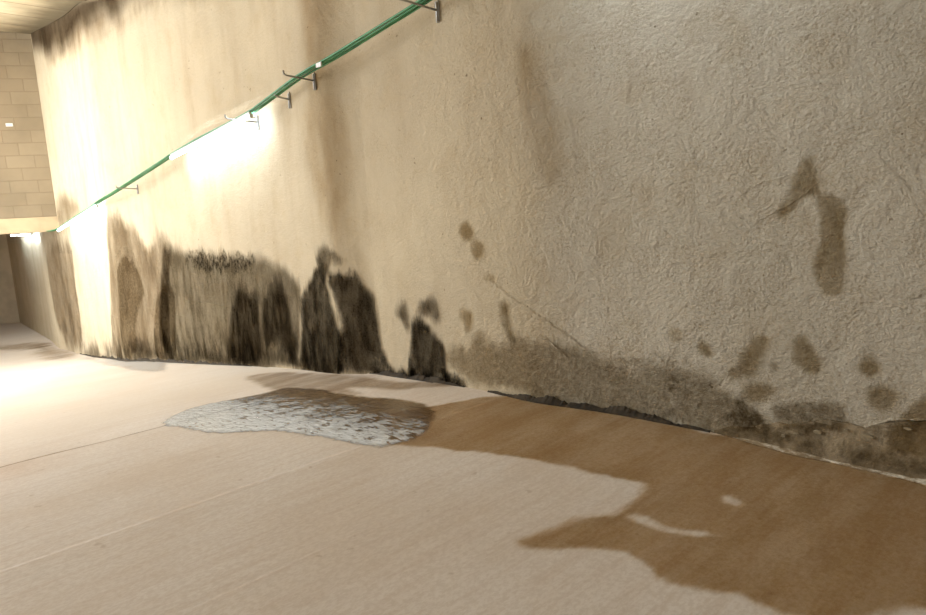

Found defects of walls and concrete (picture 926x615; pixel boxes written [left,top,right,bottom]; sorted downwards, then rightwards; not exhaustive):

damp [81,221,464,385]